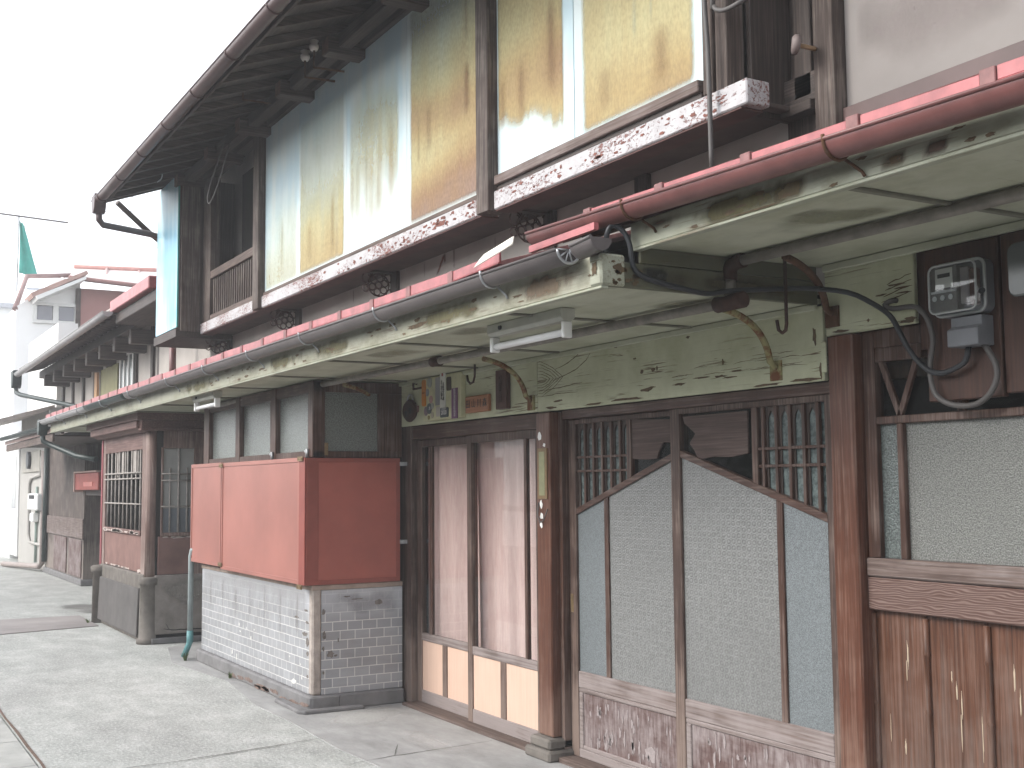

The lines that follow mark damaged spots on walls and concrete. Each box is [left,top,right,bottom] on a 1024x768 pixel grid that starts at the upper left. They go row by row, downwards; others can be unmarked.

leakage [705,178,803,222]
leakage [794,209,883,224]
peeling [675,359,742,386]
peeling [584,386,654,406]